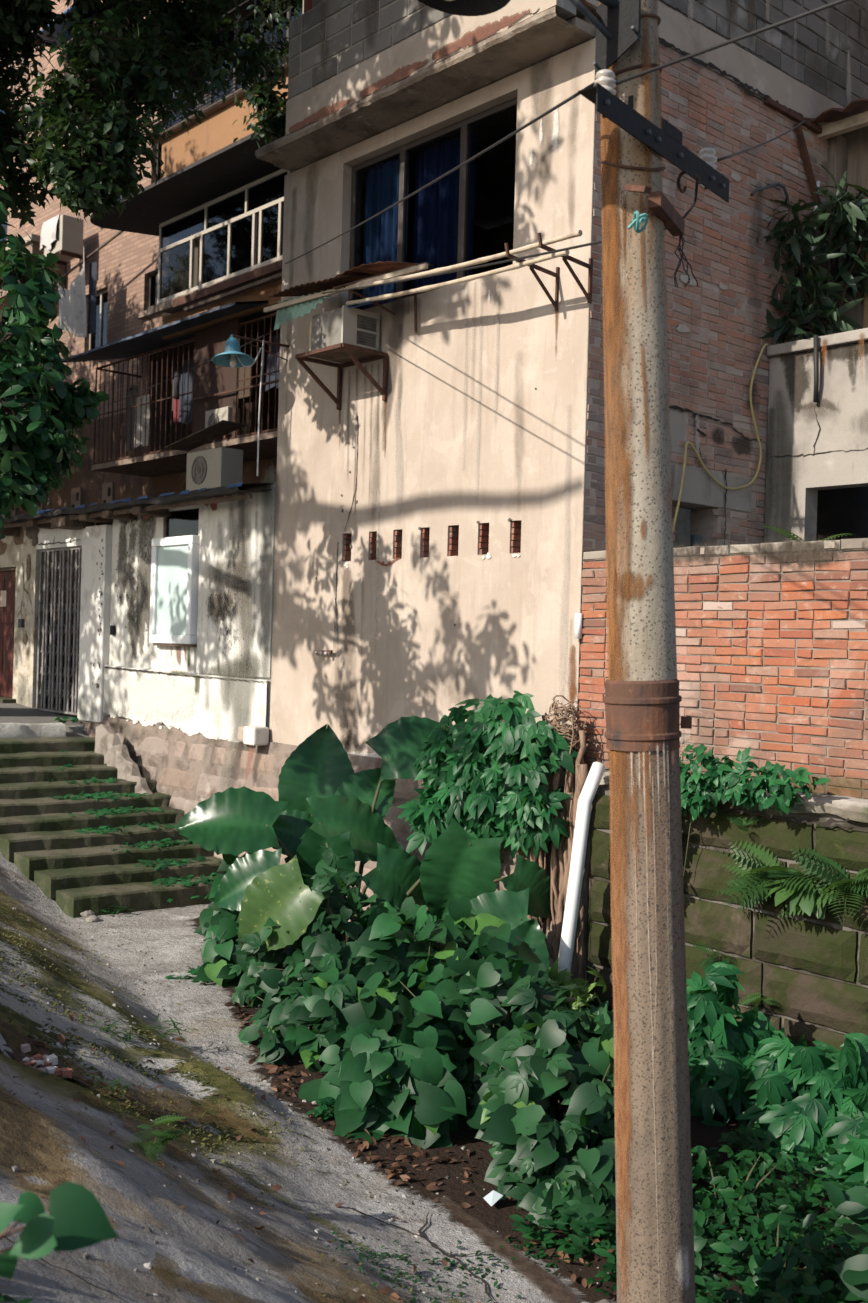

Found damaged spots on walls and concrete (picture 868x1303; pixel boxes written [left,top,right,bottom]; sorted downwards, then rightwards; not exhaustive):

rust [600,114,663,681]
crack [669,405,868,545]
leakage [117,515,156,658]
leakage [206,588,247,649]
rust [568,646,576,704]
rust [609,750,651,1280]
crack [347,1207,495,1303]